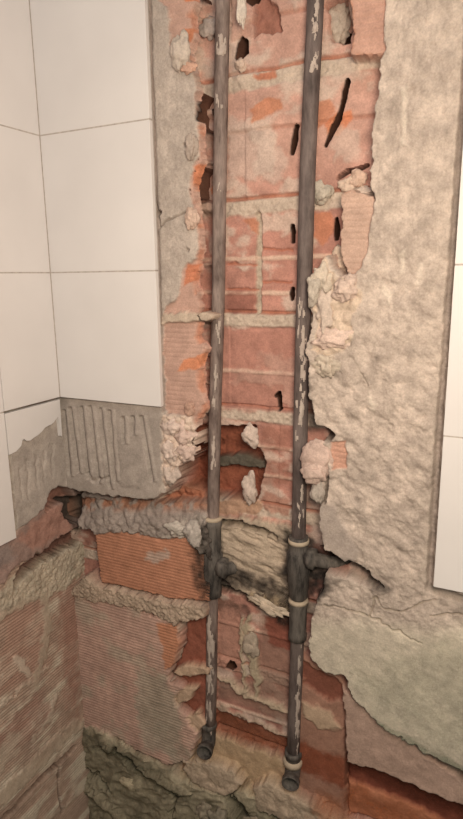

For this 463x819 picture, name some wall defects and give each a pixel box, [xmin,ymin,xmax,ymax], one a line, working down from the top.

spalling [229,0,286,73]
spalling [329,0,387,58]
spalling [159,0,215,460]
spalling [315,168,376,274]
spalling [96,519,210,601]
crack [321,545,463,645]